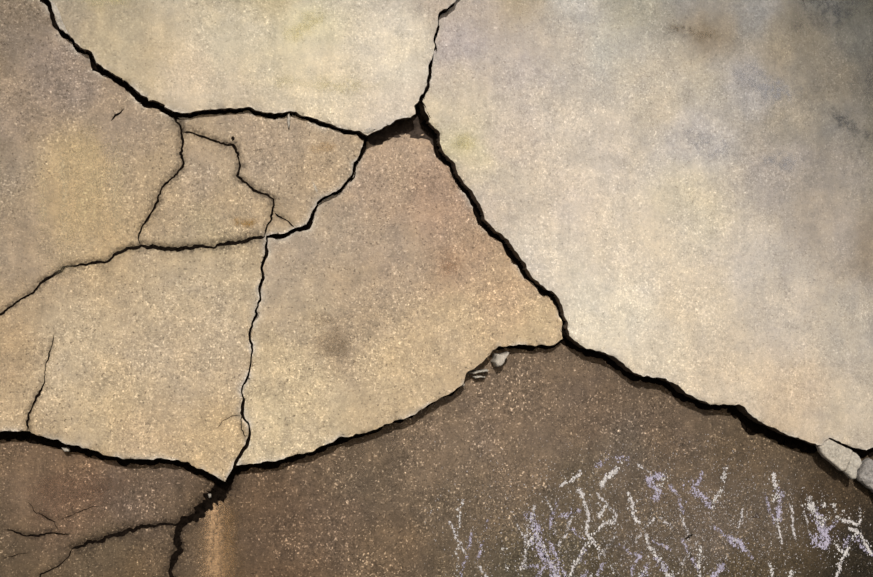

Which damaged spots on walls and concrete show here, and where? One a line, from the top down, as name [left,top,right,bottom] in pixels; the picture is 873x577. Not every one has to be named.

crack [417,3,817,454]
crack [0,0,461,577]
spalling [467,351,509,378]
flaking render [816,439,873,493]
crack [842,445,873,459]